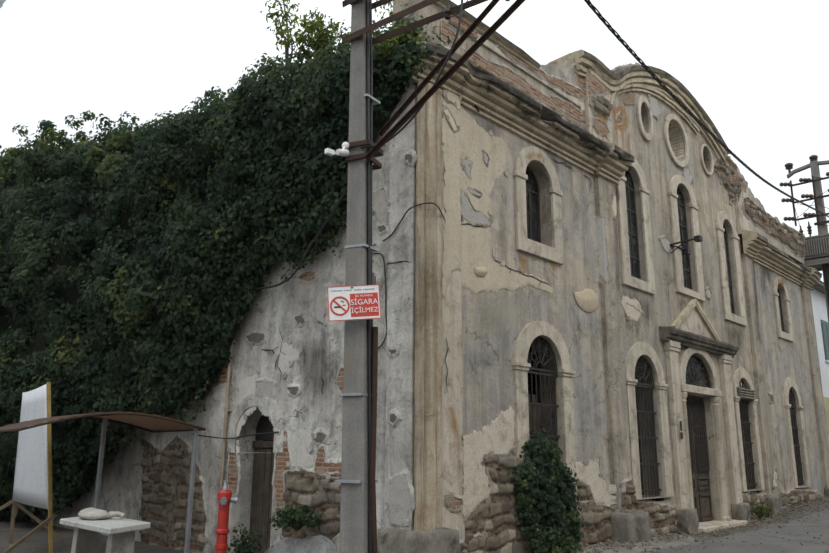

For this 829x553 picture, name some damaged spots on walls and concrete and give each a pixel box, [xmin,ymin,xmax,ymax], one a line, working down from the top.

flaking render [436,6,636,138]
flaking render [647,94,661,120]
flaking render [442,89,554,297]
crack [492,249,554,291]
flaking render [139,433,209,553]
flaking render [226,440,241,497]
flaking render [272,426,342,543]
flaking render [443,443,550,553]